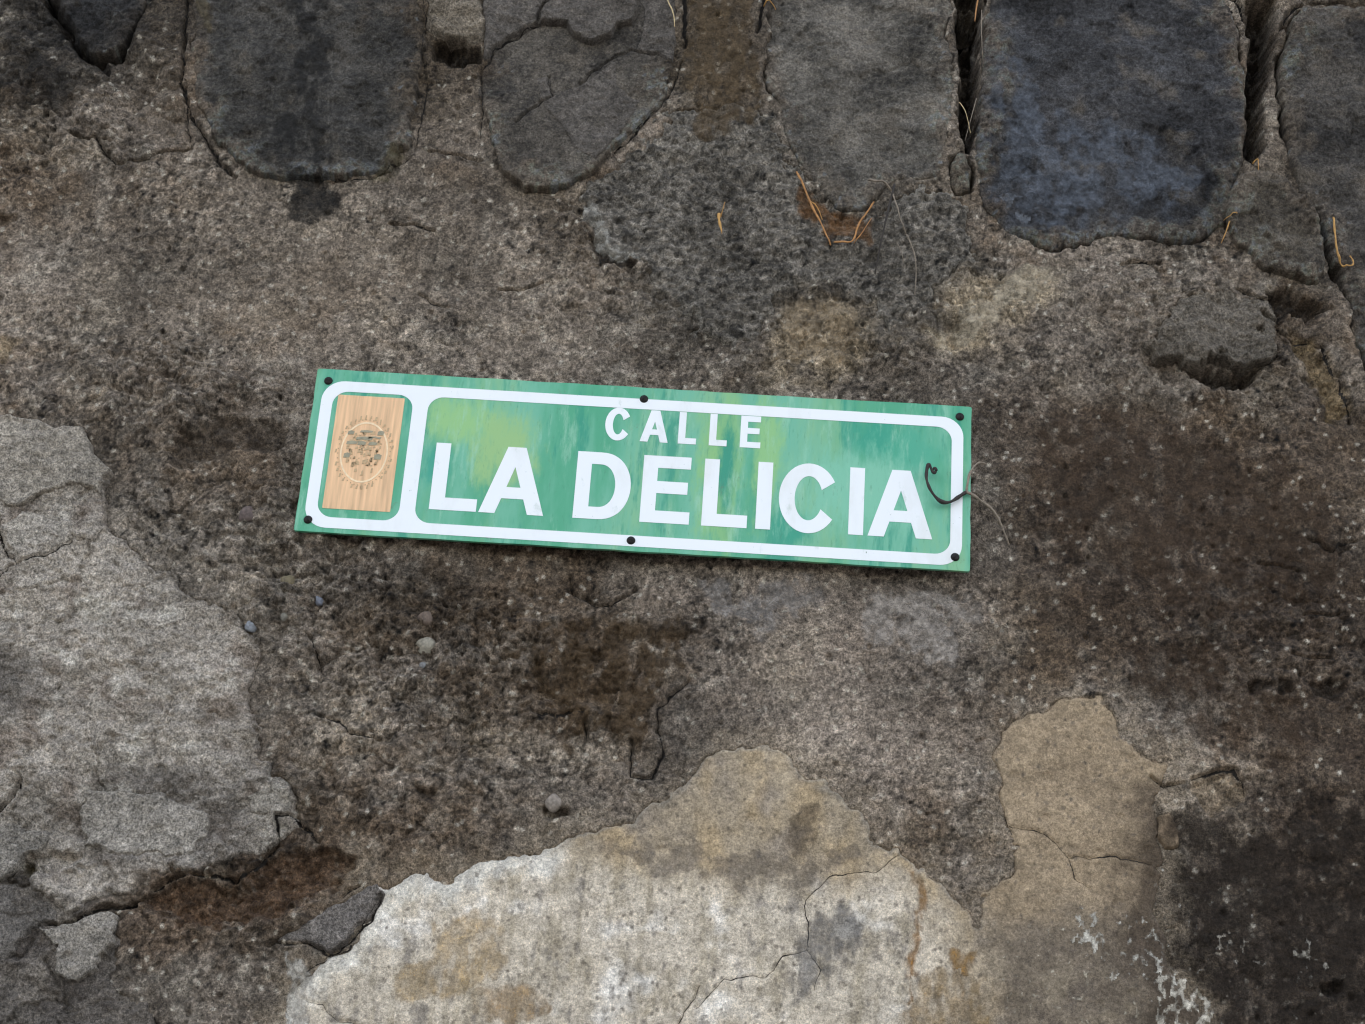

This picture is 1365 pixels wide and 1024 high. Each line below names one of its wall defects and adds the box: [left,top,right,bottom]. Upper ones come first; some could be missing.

crack [333,0,539,184]
crack [585,0,688,159]
spalling [0,414,300,1024]
peeling [276,695,1205,1024]
crack [679,857,895,1023]
rust [950,949,973,976]
efflorescence [1061,908,1104,953]
water stain [1122,792,1365,1024]